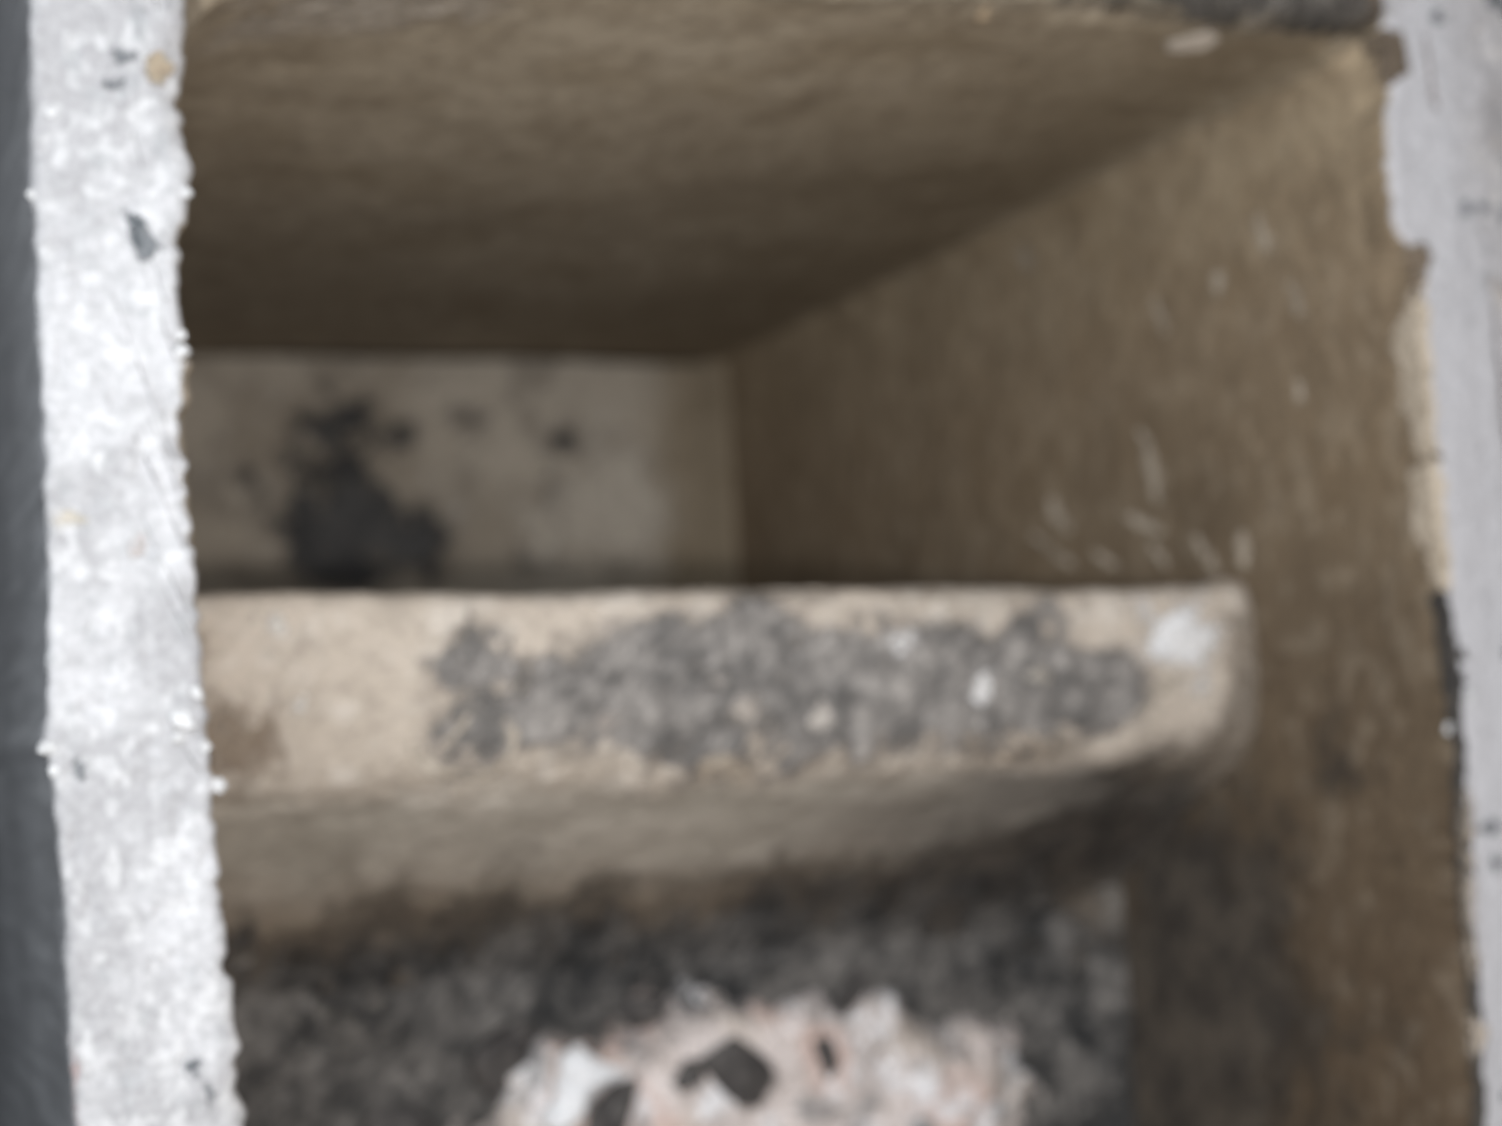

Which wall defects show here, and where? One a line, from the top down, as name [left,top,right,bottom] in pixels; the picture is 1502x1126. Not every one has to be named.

spalling [423,591,1151,785]